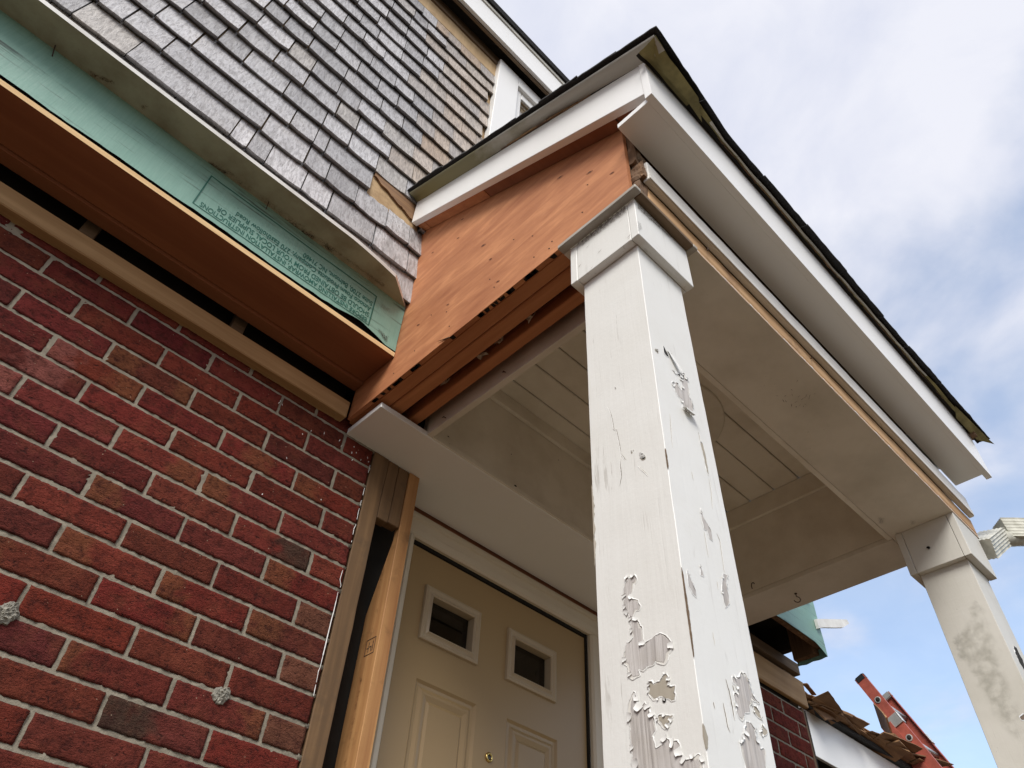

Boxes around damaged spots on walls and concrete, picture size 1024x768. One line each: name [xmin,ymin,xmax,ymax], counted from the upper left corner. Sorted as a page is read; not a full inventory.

peeling [655,346,698,417]
peeling [621,565,708,768]
peeling [731,670,768,768]